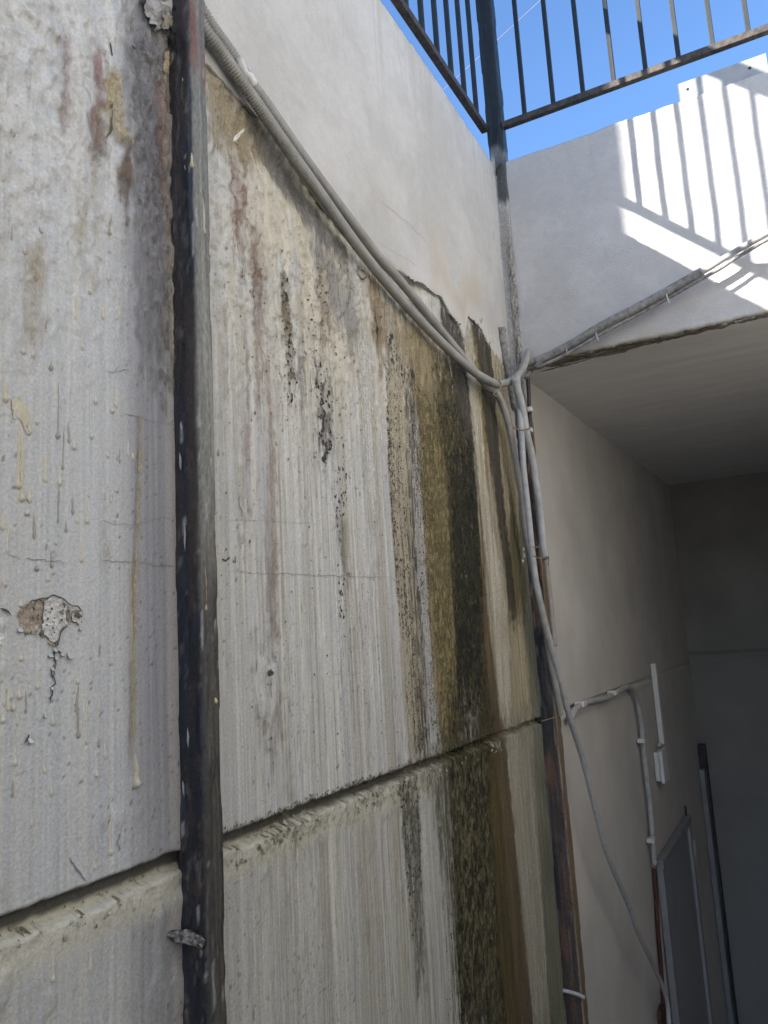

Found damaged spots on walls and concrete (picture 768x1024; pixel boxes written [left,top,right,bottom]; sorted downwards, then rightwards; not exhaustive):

rust [89,47,107,156]
water stain [205,70,567,1024]
spalling [0,595,83,660]
crack [44,634,61,718]